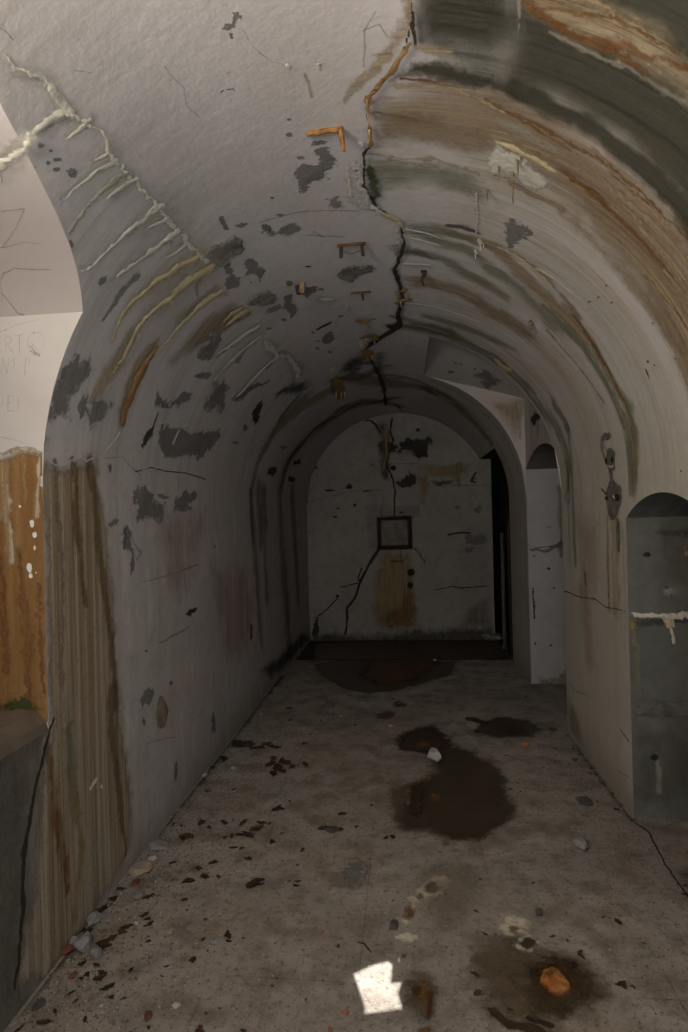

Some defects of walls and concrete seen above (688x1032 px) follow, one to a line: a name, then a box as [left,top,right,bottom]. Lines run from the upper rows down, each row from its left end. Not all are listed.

corrosion [522,0,688,84]
leakage [0,53,224,427]
peeling [294,140,337,193]
crack [345,1,417,517]
corrosion [355,43,688,382]
leakage [487,99,688,315]
corrosion [0,446,48,722]
peeling [108,485,197,574]
peeling [158,424,221,461]
crack [311,548,380,638]
leakage [630,611,688,696]
crack [13,717,55,990]